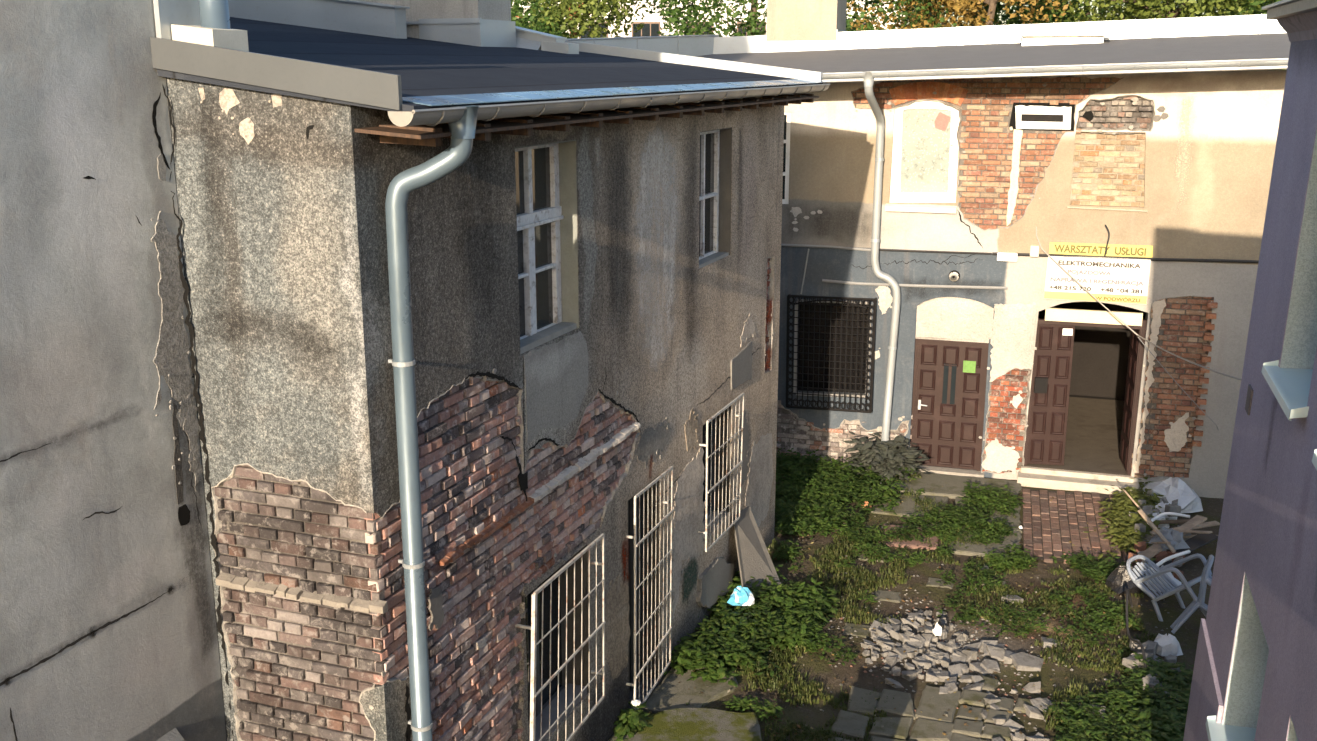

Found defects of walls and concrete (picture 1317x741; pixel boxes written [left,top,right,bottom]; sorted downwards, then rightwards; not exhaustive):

peeling [198,88,255,144]
spalling [851,76,1169,231]
leakage [637,133,677,360]
crack [0,443,50,462]
crack [83,507,121,520]
crack [152,84,234,741]
spalling [151,211,409,741]
spalling [417,368,706,741]
spalling [737,400,915,527]
spalling [979,302,1037,474]
spalling [1130,295,1214,479]
crack [0,586,173,741]